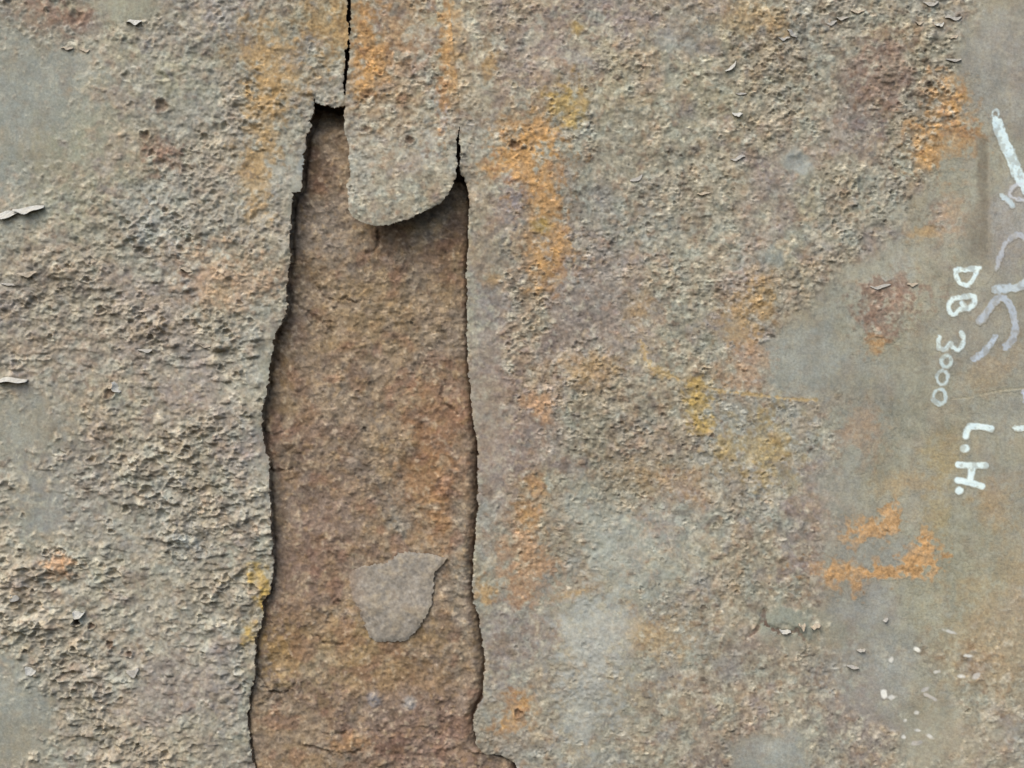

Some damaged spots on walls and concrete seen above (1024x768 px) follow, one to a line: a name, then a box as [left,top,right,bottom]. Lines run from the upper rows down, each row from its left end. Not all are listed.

crack [343,0,352,104]
rust [420,0,600,312]
rust [825,9,1003,187]
spalling [247,0,517,768]
rust [588,251,1024,715]